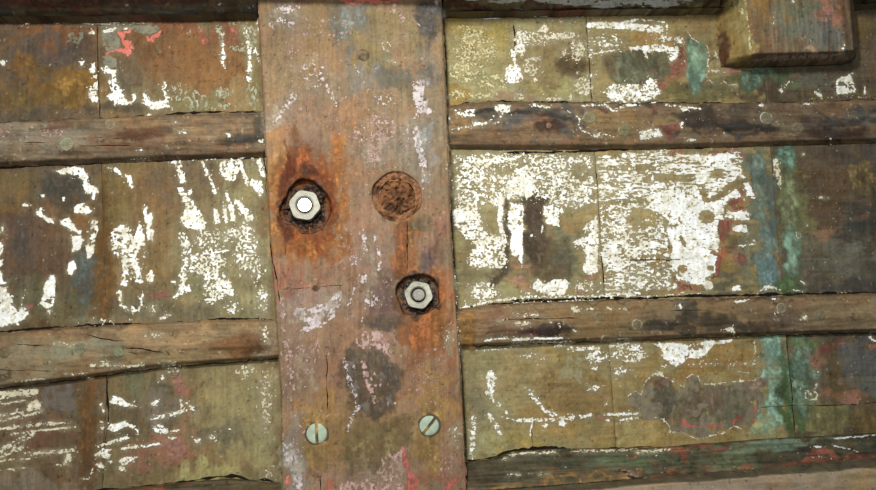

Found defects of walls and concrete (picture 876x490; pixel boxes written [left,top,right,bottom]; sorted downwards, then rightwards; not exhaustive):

peeling [67,0,437,198]
peeling [442,0,741,140]
peeling [0,227,56,327]
peeling [22,166,99,275]
peeling [87,157,402,490]
corrosion [267,140,349,259]
crack [403,223,411,269]
corrosion [394,222,475,351]
peeling [413,144,765,441]
peeling [770,158,782,189]
peeling [0,356,148,471]
peeling [435,415,476,490]